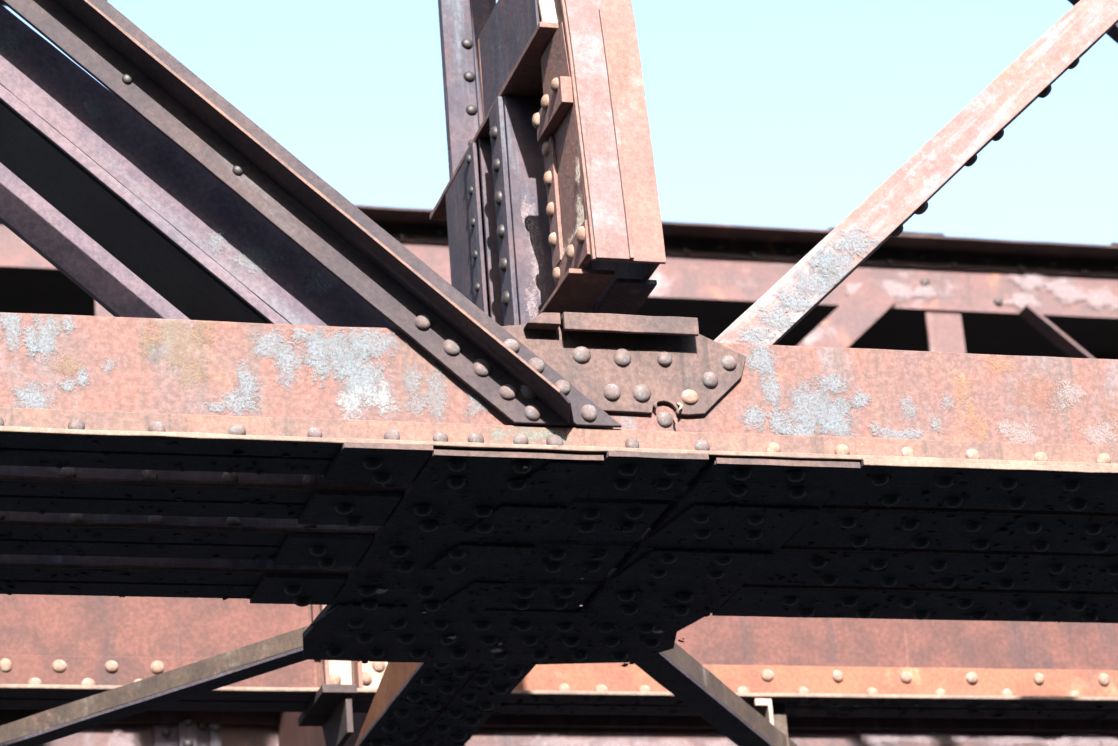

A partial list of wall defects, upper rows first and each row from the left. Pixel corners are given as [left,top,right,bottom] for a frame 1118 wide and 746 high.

peeling [882,280,936,302]
peeling [1004,274,1118,311]
peeling [0,313,75,363]
peeling [738,225,881,437]
peeling [12,367,89,409]
peeling [202,325,448,420]
peeling [467,390,485,416]
peeling [871,395,952,439]